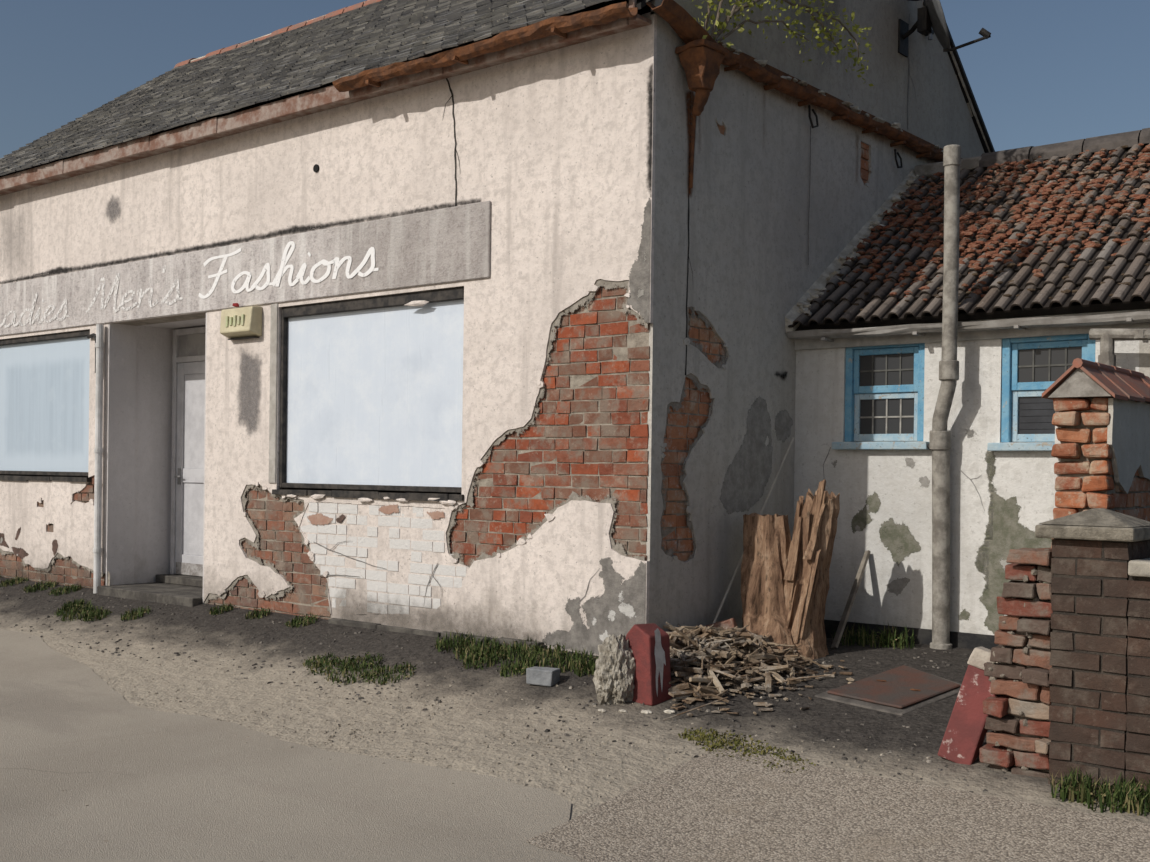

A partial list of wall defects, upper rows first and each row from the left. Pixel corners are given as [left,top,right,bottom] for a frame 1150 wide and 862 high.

crack [442,78,460,205]
flaking render [860,142,875,187]
water stain [2,199,481,284]
flaking render [683,306,729,369]
water stain [239,353,260,431]
flaking render [204,194,717,655]
flaking render [69,477,103,505]
flaking render [0,522,110,589]
peeling [851,492,921,595]
peeling [975,451,1052,634]